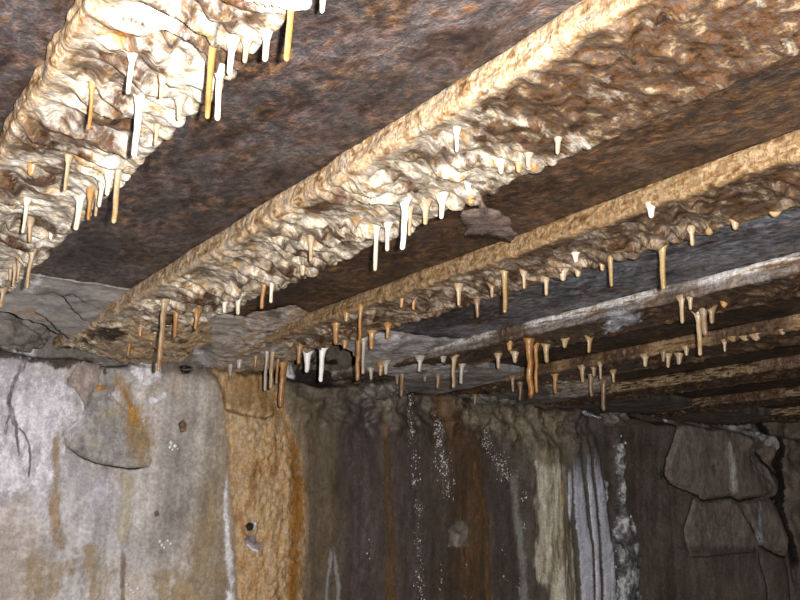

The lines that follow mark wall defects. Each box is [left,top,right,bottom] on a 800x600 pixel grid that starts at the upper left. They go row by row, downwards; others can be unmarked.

water stain [0,0,313,296]
water stain [53,0,800,360]
crack [4,362,32,477]
crack [35,312,70,340]
crack [43,292,88,321]
spalling [294,358,342,387]
water stain [303,398,384,600]
water stain [394,401,434,600]
water stain [331,252,800,384]
water stain [449,314,800,600]